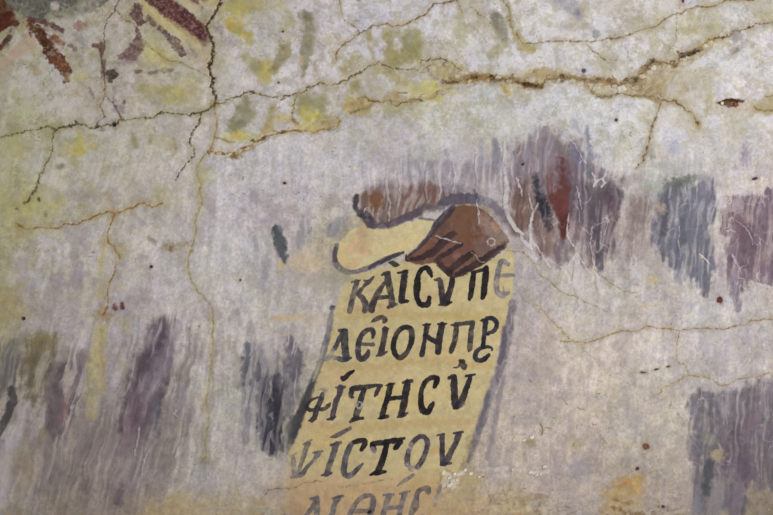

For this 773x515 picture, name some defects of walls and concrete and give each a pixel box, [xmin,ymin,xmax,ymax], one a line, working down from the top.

crack [332,0,773,80]
flaking render [203,24,746,161]
crack [591,94,702,171]
flaking render [700,98,761,119]
crack [751,90,773,116]
crack [0,0,496,463]
crack [482,220,773,397]